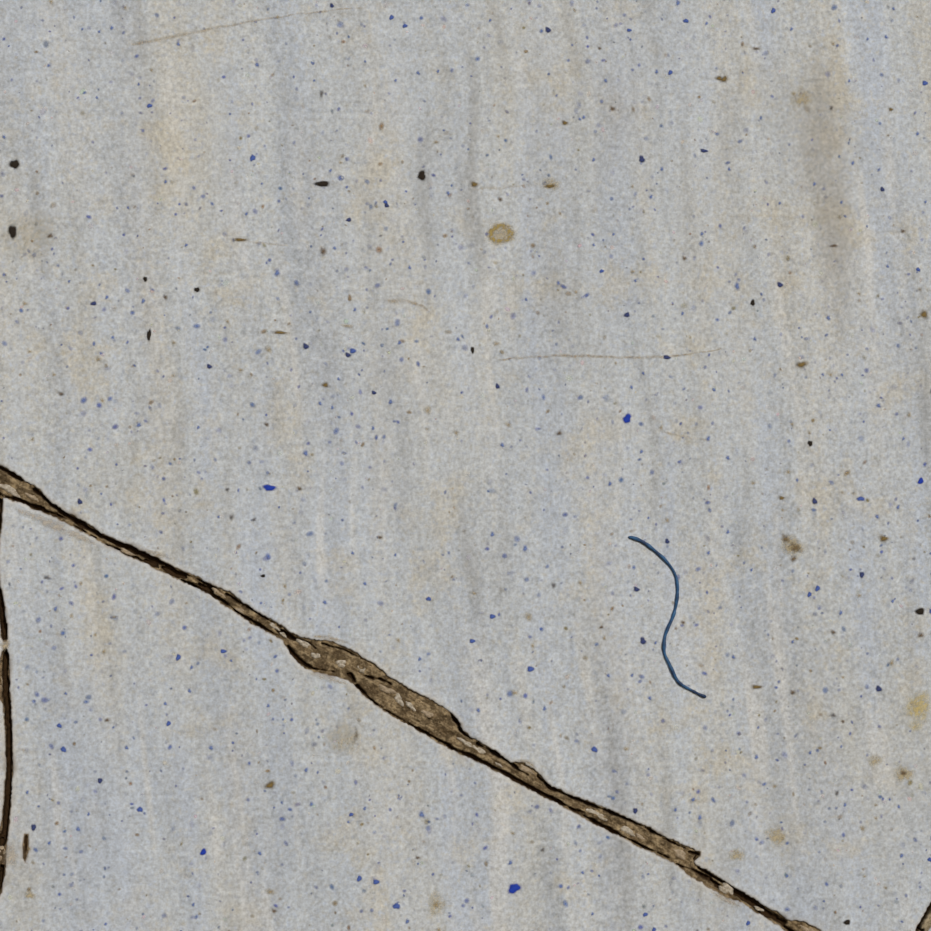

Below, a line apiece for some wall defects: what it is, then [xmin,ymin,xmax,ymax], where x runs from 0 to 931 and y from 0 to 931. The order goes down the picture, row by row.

crack [0,466,820,931]
crack [916,902,931,931]